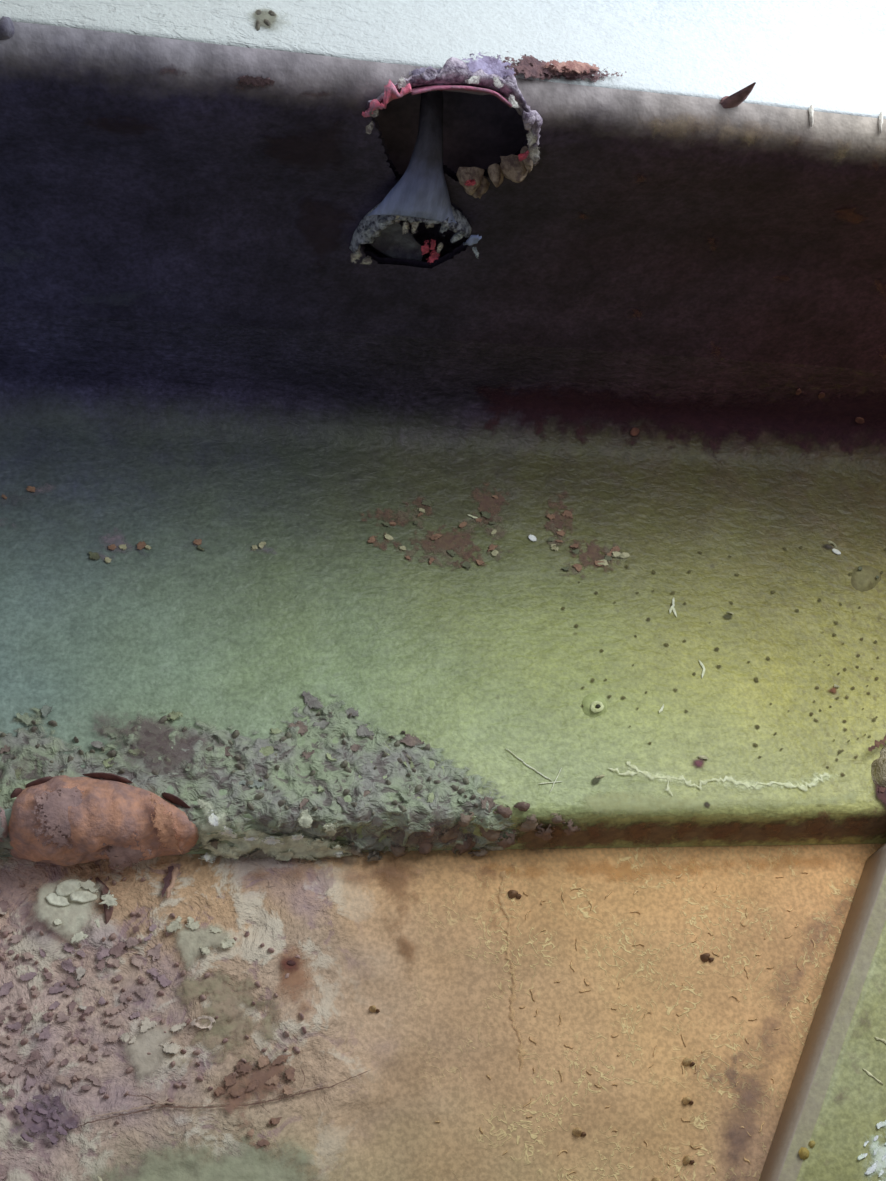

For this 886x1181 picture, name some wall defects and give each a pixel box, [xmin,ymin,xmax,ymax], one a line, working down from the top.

crack [67,1068,372,1131]